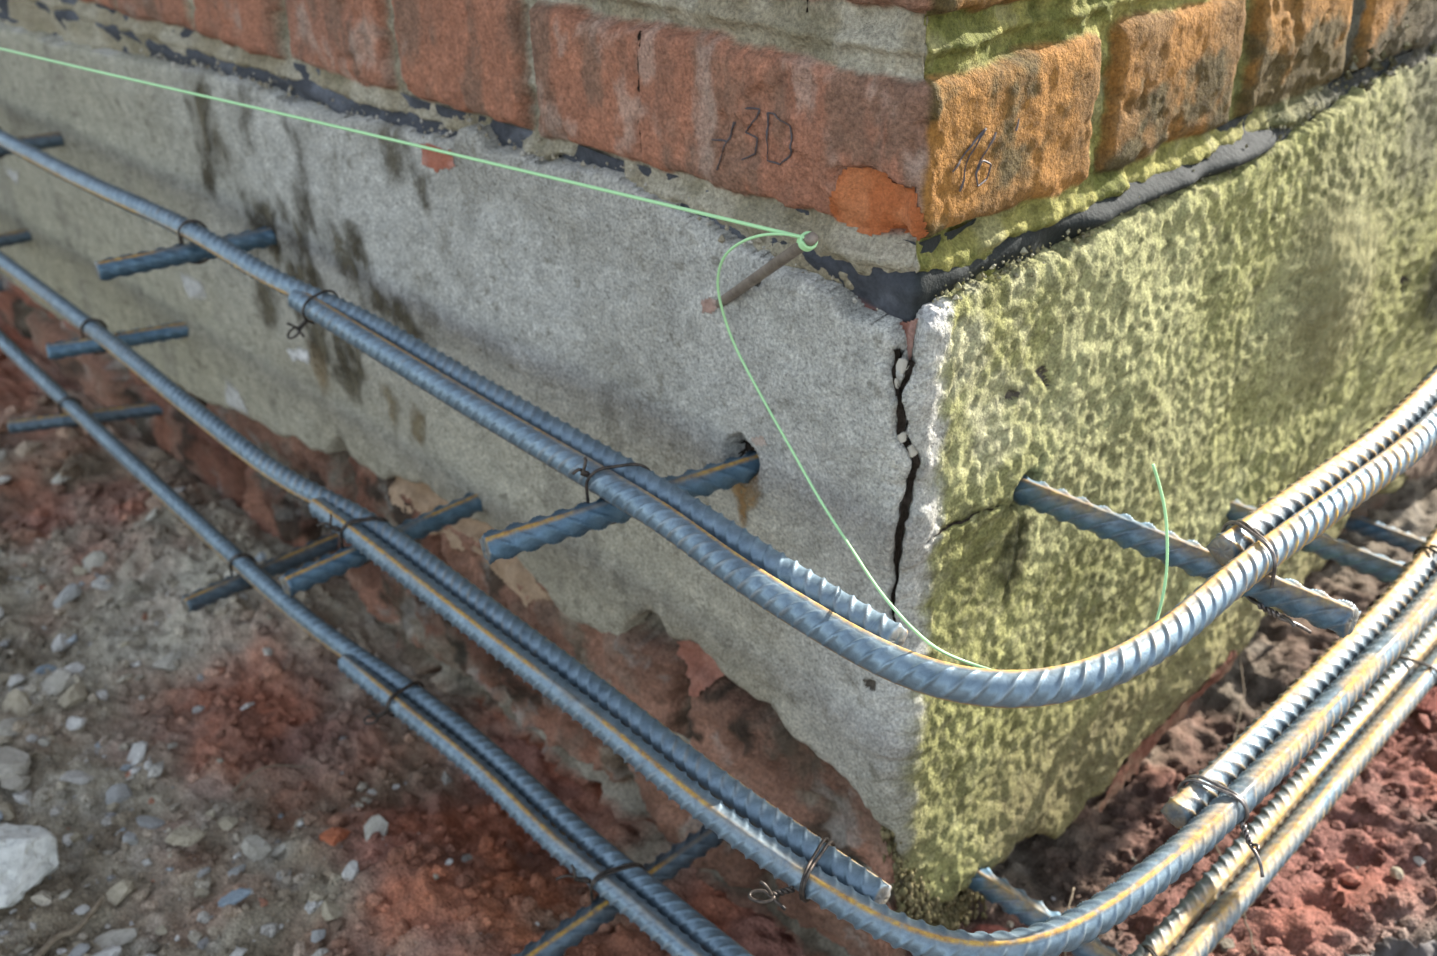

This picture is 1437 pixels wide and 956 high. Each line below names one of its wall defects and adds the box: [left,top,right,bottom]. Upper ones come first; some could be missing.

water stain [185,83,226,194]
water stain [379,127,402,176]
water stain [255,280,276,326]
water stain [241,183,323,291]
water stain [334,223,421,339]
water stain [287,310,363,402]
spalling [389,476,449,515]
crack [891,349,1003,622]
spalling [430,518,552,608]
water stain [999,518,1030,599]
spalling [676,640,724,698]
spalling [863,679,876,691]